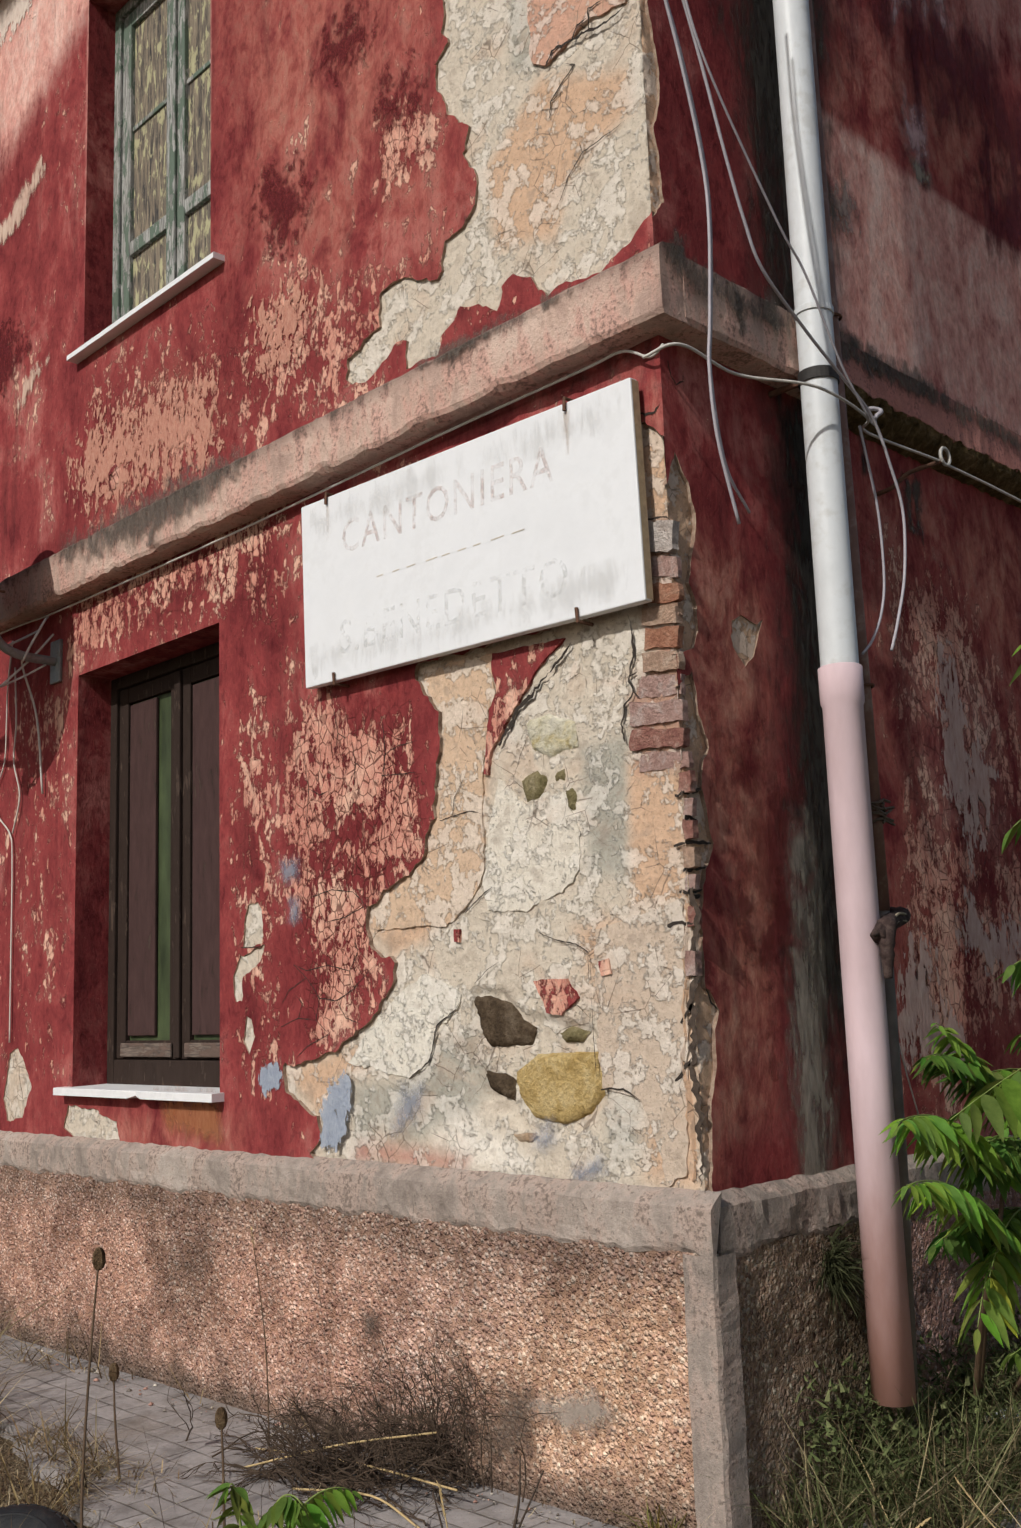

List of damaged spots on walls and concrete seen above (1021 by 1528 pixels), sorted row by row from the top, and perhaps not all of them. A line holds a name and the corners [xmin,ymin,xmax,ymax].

peeling [64,353,227,527]
peeling [242,261,325,385]
spalling [346,0,664,385]
leakage [718,0,795,312]
leakage [812,0,1021,267]
leakage [840,331,1021,451]
spalling [283,422,719,1191]
peeling [934,634,1021,999]
crack [667,787,718,1185]
peeling [896,929,967,1078]